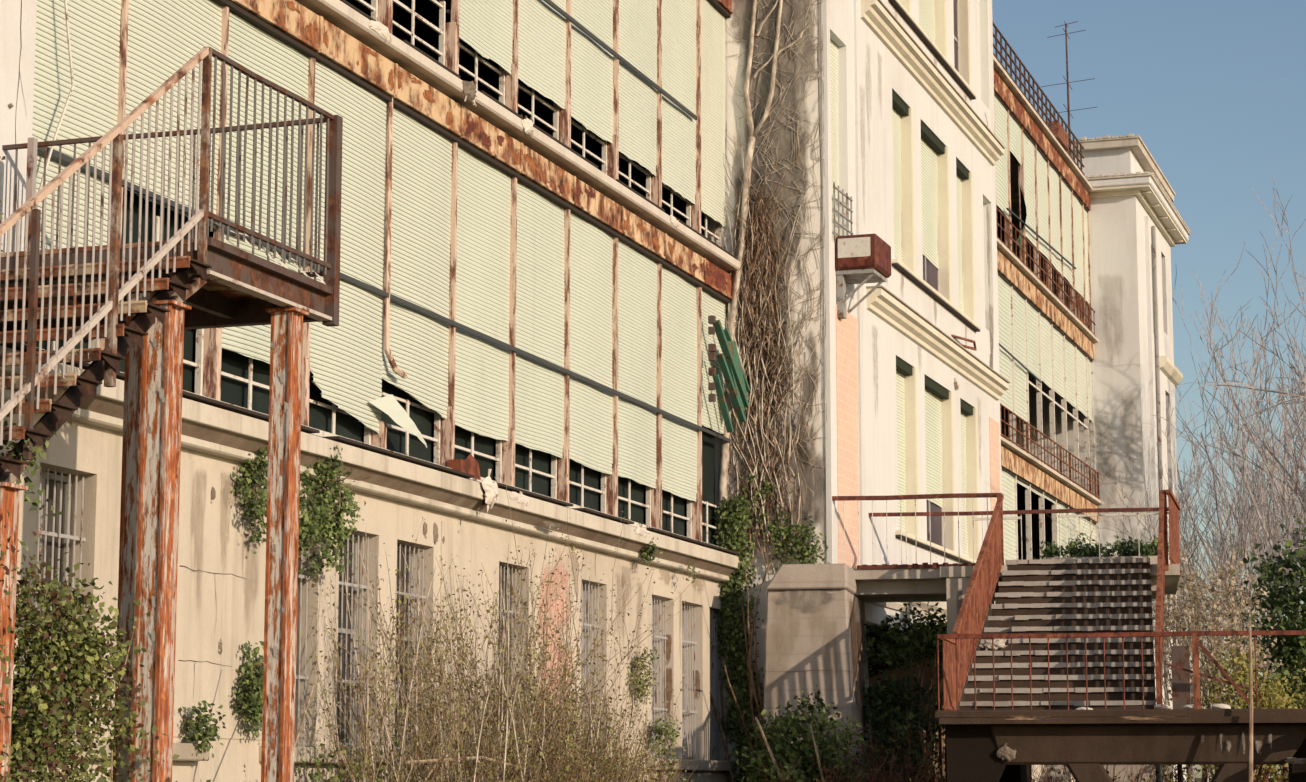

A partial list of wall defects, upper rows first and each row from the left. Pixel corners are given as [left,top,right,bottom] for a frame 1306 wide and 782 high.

rust [388,69,504,150]
rust [514,149,596,204]
rust [620,217,673,256]
rust [150,327,166,403]
rust [270,332,286,385]
rust [269,502,285,626]
rust [267,683,279,776]